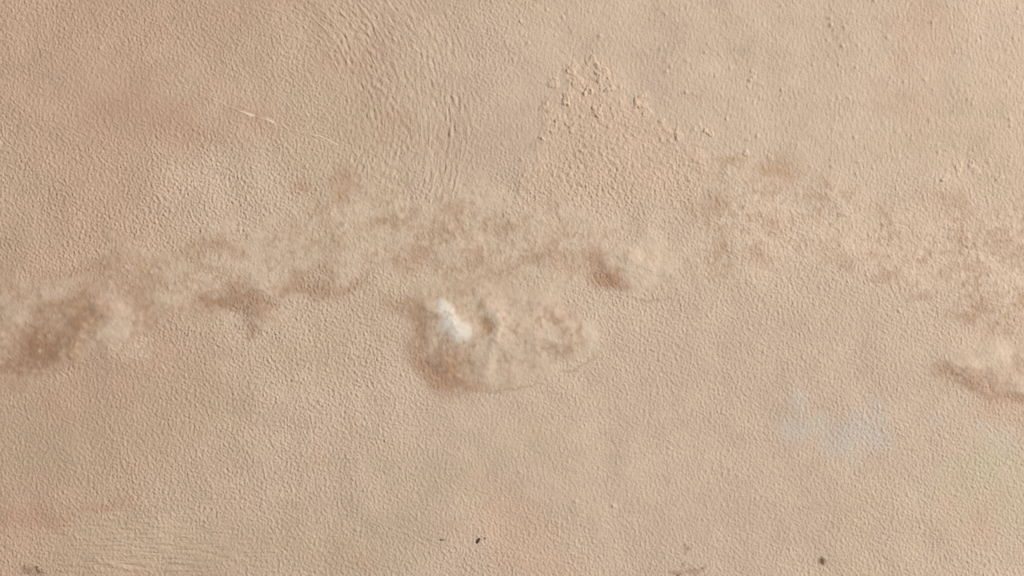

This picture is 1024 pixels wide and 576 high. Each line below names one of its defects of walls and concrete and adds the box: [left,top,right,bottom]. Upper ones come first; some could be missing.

water stain [306,30,380,82]
water stain [0,104,633,416]
water stain [671,146,1024,408]